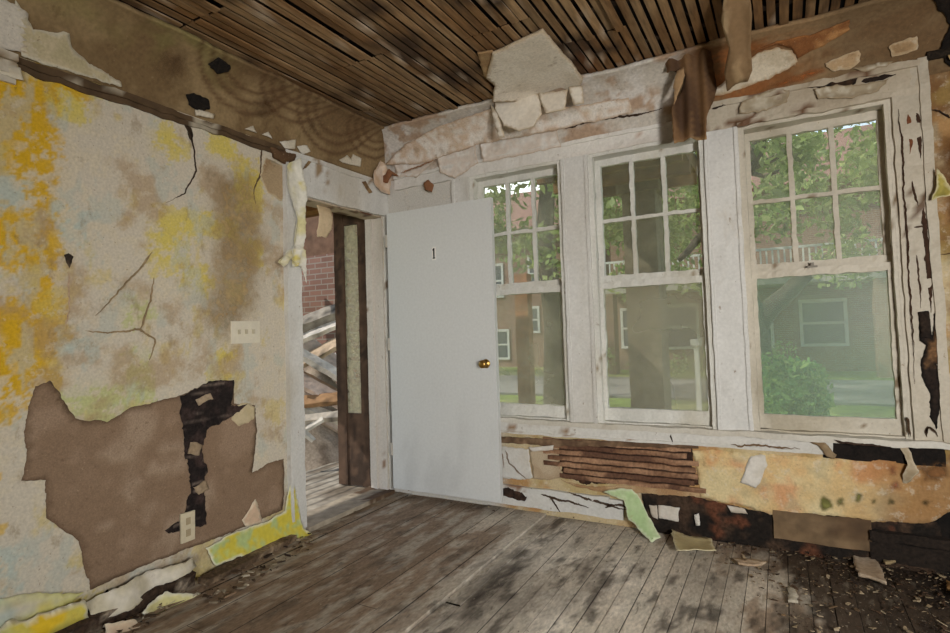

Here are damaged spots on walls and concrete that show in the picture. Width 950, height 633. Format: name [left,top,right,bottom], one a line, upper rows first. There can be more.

peeling [0,0,122,87]
peeling [715,20,850,114]
peeling [813,36,918,99]
crack [166,125,197,203]
peeling [383,157,439,192]
peeling [480,131,561,162]
crack [65,252,156,360]
flaking render [21,380,284,590]
peeling [502,445,748,522]
mould [821,497,843,510]
spalling [930,512,950,538]